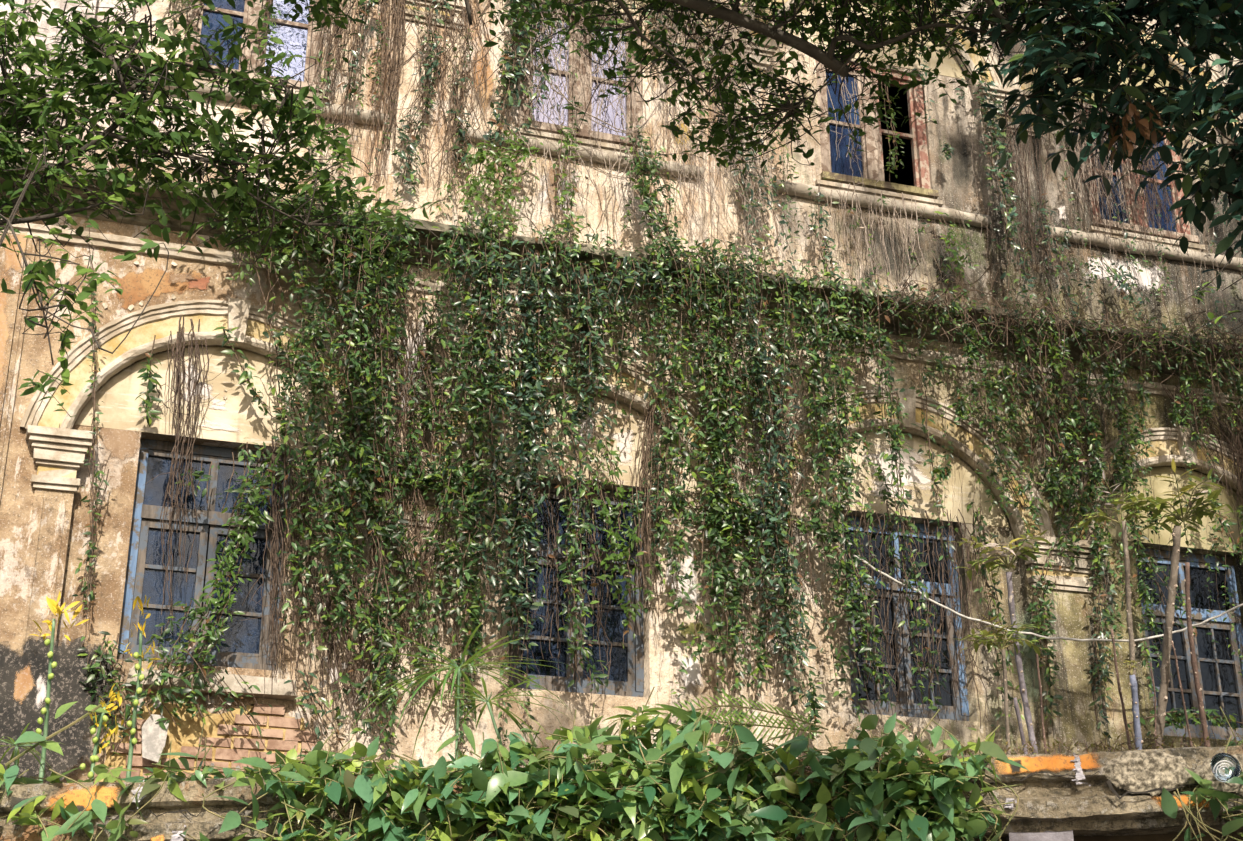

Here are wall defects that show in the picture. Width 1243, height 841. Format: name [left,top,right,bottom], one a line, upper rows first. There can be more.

peeling [94,260,211,311]
peeling [1086,258,1162,294]
mould [0,636,117,783]
spalling [98,668,317,809]